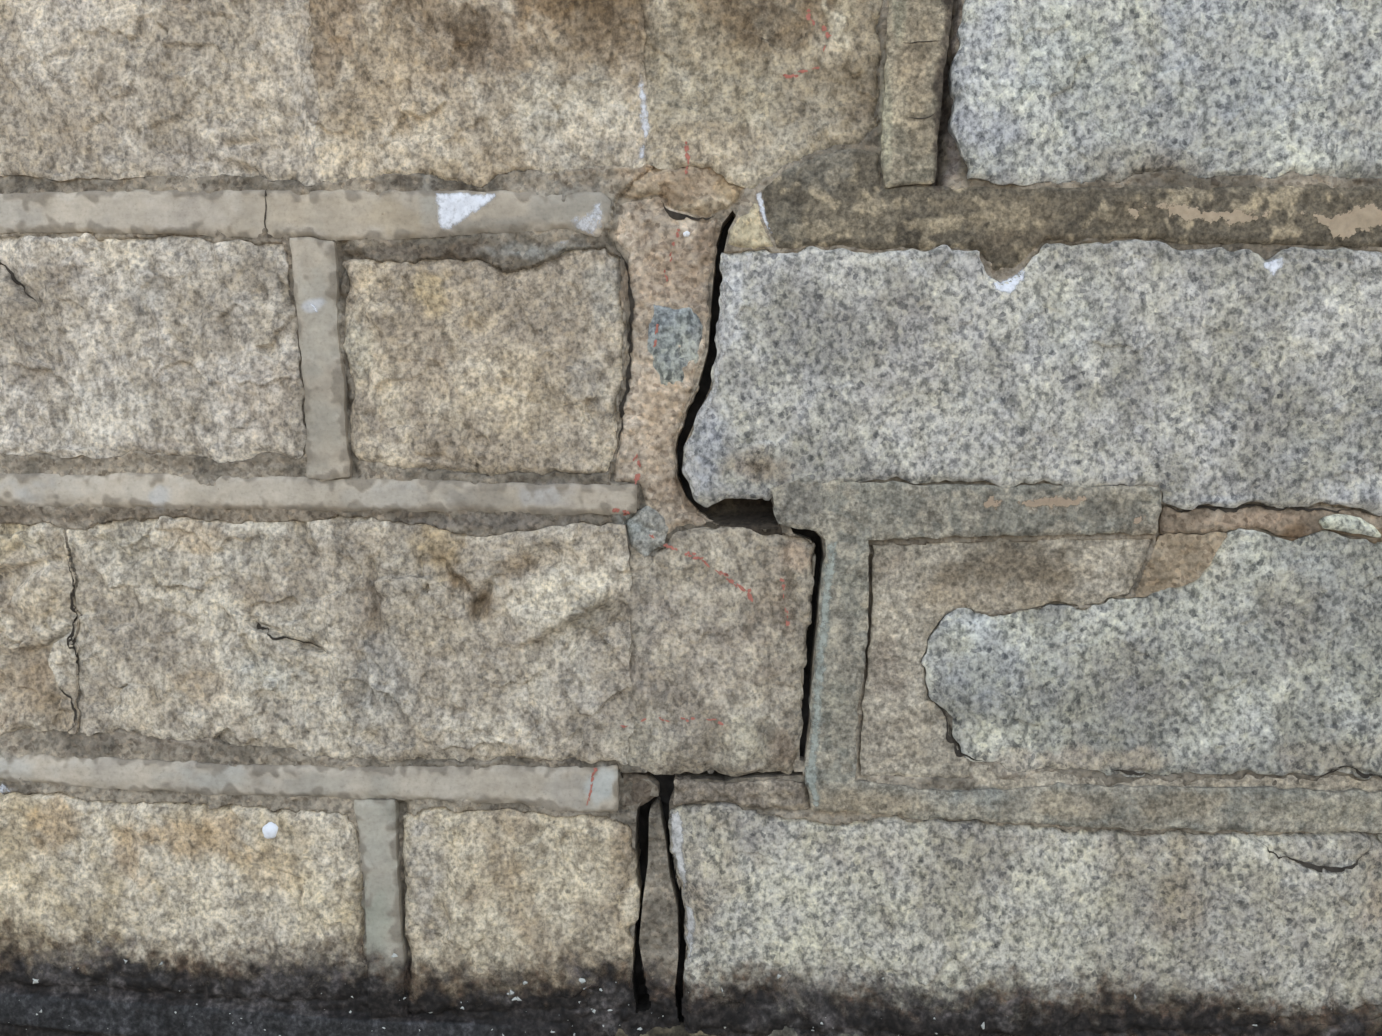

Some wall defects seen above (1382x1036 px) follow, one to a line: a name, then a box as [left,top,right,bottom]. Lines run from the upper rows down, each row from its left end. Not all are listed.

crack [661,201,821,772]
crack [60,558,80,732]
crack [634,771,706,1002]
damp [0,921,1382,1036]